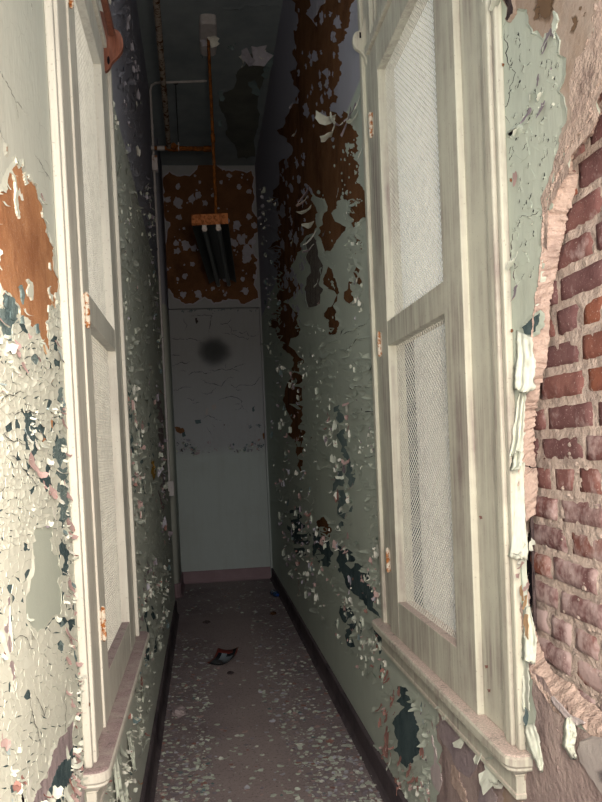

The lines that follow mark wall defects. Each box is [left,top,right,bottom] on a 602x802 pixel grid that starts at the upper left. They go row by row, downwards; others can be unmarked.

crack [0,69,29,143]
peeling [0,143,60,370]
peeling [105,45,274,802]
flaking render [266,0,602,802]
peeling [23,520,62,640]
peeling [32,713,87,802]